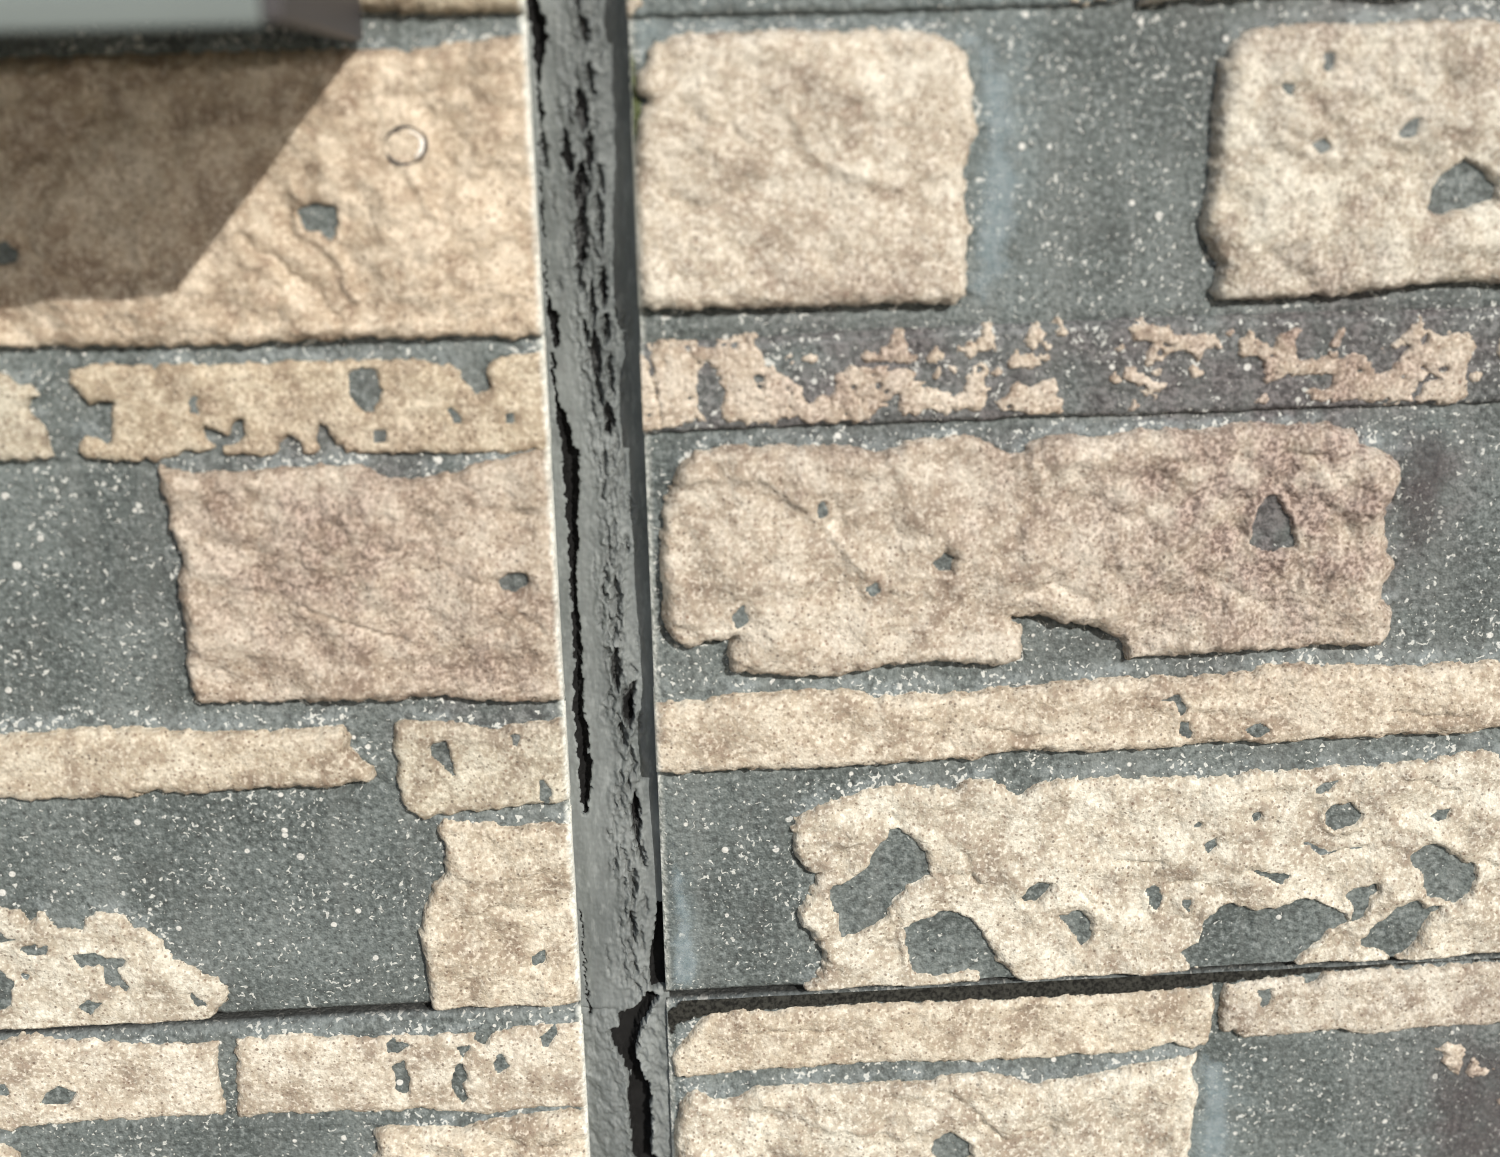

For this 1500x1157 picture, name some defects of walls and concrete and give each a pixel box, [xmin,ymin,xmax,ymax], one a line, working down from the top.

peeling [639,306,1500,434]
crack [526,0,634,813]
crack [631,793,640,844]
spalling [1316,780,1361,831]
spalling [0,970,14,1010]
spalling [73,953,129,991]
spalling [830,828,930,937]
spalling [904,911,1014,979]
spalling [1021,882,1050,901]
spalling [1059,910,1092,945]
spalling [1181,844,1475,967]
crack [580,901,665,1157]